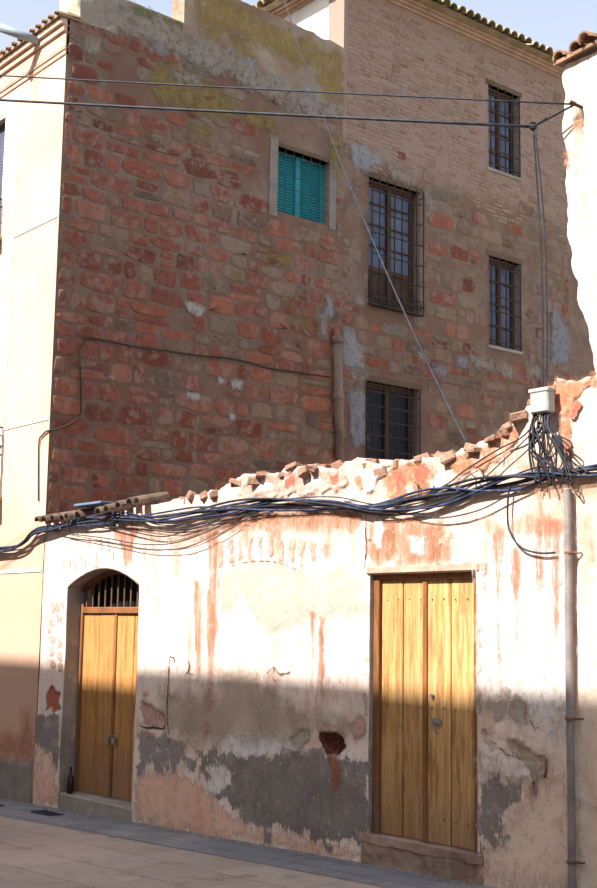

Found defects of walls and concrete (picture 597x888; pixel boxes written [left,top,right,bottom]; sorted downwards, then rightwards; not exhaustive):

spalling [237,426,517,509]
peeling [472,528,575,740]
peeling [33,750,59,805]
peeling [134,692,367,861]
peeling [481,738,582,888]